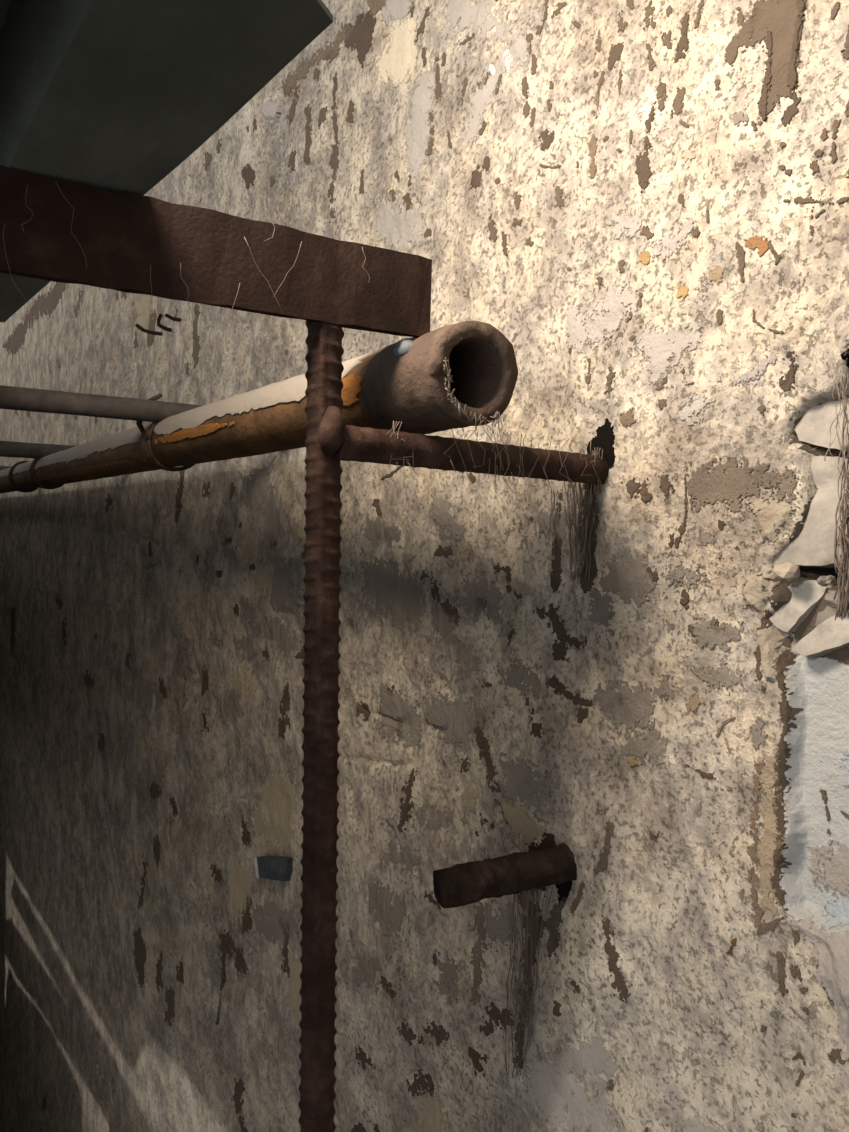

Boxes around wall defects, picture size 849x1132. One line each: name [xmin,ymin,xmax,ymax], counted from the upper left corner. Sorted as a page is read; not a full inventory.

spalling [732,111,749,127]
spalling [789,416,848,458]
spalling [789,485,817,543]
spalling [767,554,849,641]
spalling [755,646,849,934]
rust [526,832,556,852]